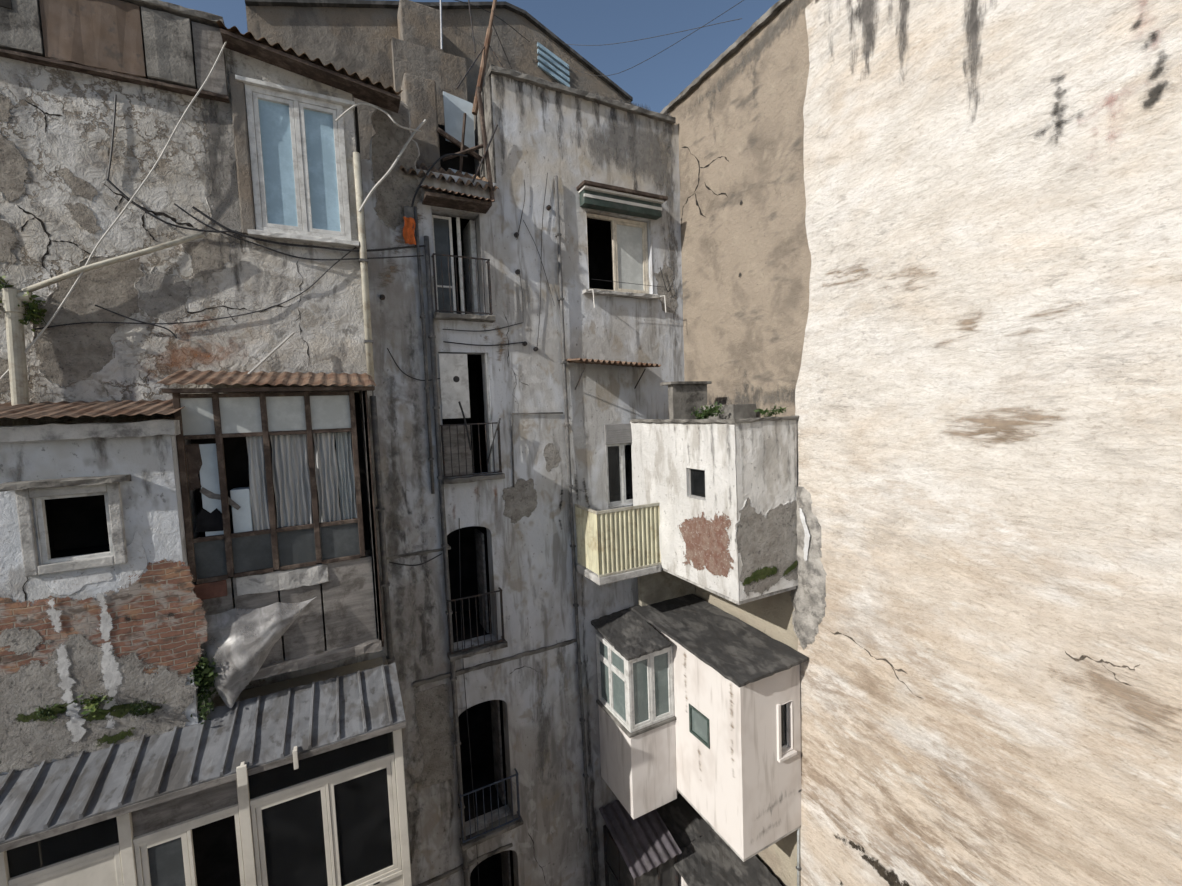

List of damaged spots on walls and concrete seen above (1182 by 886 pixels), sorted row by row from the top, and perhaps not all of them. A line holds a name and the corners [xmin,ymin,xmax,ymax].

leakage [849,0,876,72]
leakage [889,0,909,61]
leakage [963,0,980,77]
crack [25,100,62,133]
leakage [1036,74,1081,140]
leakage [1143,55,1168,107]
crack [681,146,729,226]
flaking render [543,443,561,472]
flaking render [501,478,538,524]
flaking render [678,498,798,596]
flaking render [0,530,208,687]
crack [834,835,909,886]